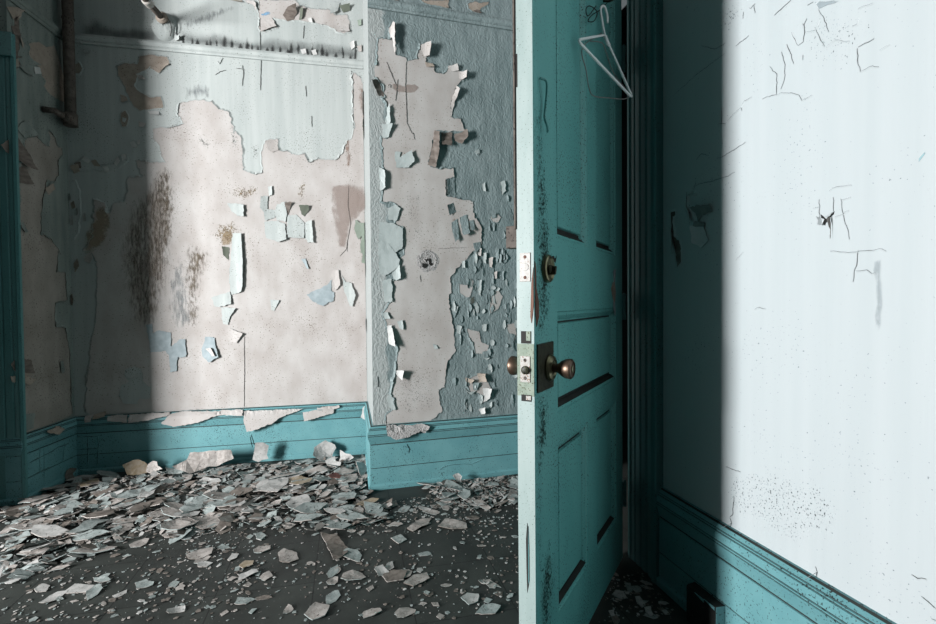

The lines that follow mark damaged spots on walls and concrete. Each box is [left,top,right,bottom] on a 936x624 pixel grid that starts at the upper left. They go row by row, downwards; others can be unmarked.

peeling [233,0,362,52]
crack [674,0,890,125]
water stain [130,174,173,321]
water stain [175,253,204,320]
peeling [1,7,517,440]
crack [813,185,886,282]